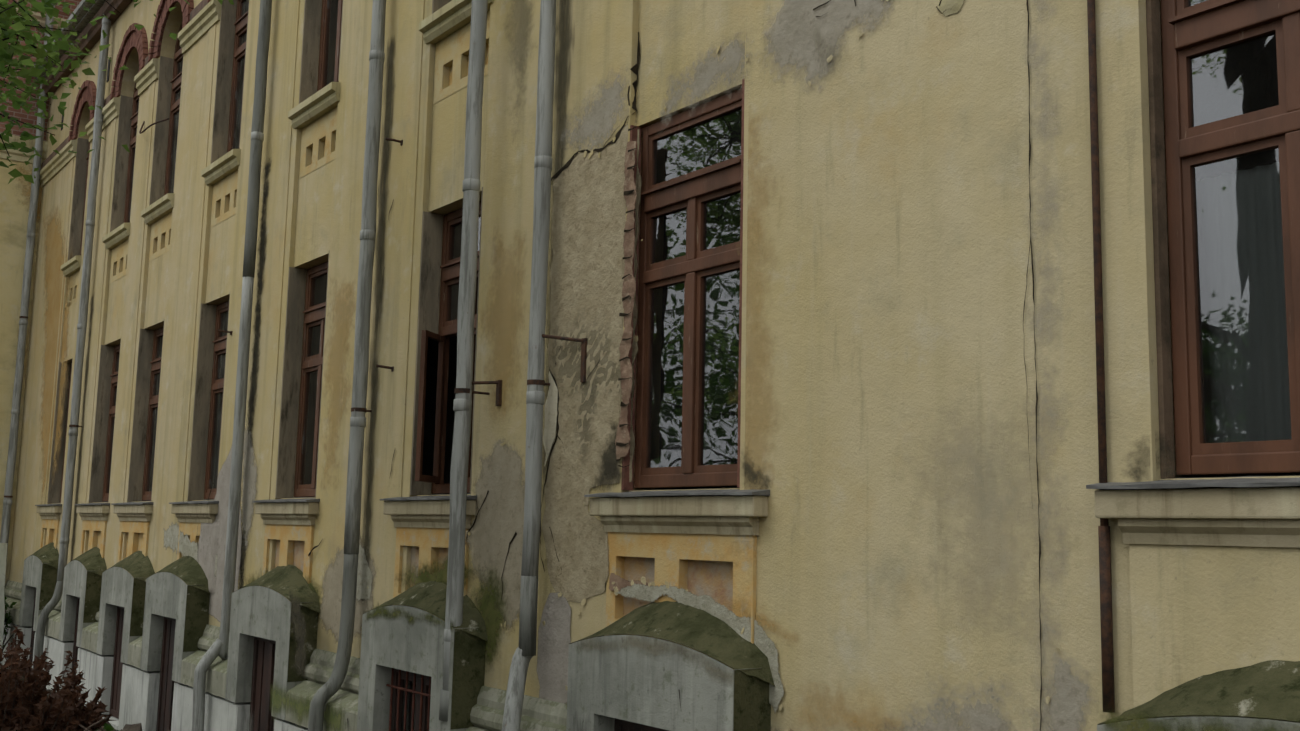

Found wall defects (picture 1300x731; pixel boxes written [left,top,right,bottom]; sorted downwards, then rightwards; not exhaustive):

crack [465,491,489,545]
flaking render [466,440,525,627]
crack [501,32,640,600]
flaking render [537,124,784,713]
peeling [765,0,891,86]
crack [1023,0,1042,731]